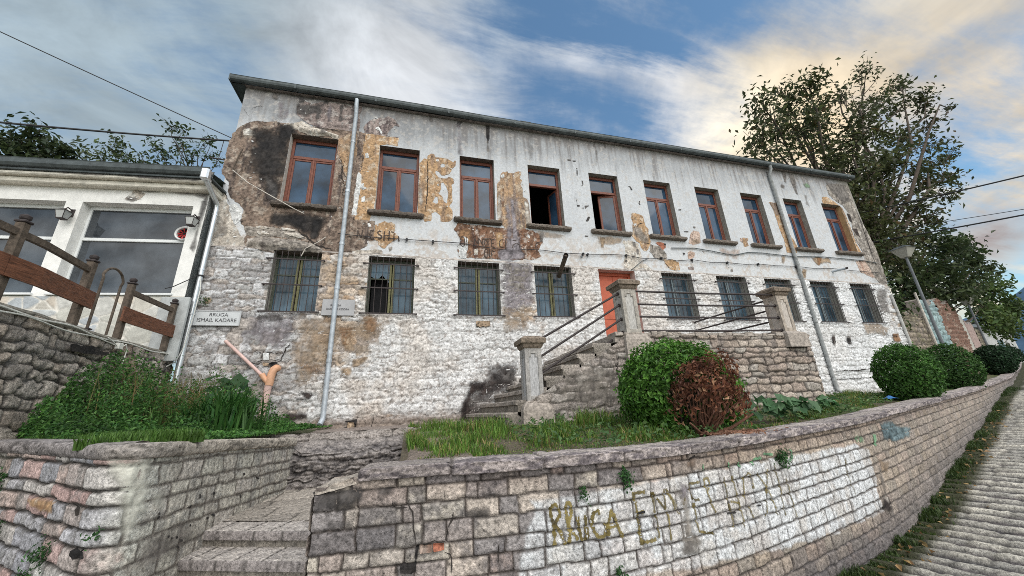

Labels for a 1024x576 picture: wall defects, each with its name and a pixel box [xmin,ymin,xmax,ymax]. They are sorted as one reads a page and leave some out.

water stain [251,91,362,200]
water stain [310,219,321,239]
peeling [418,154,456,222]
peeling [497,170,531,238]
flaking render [623,201,704,271]
water stain [461,366,515,420]